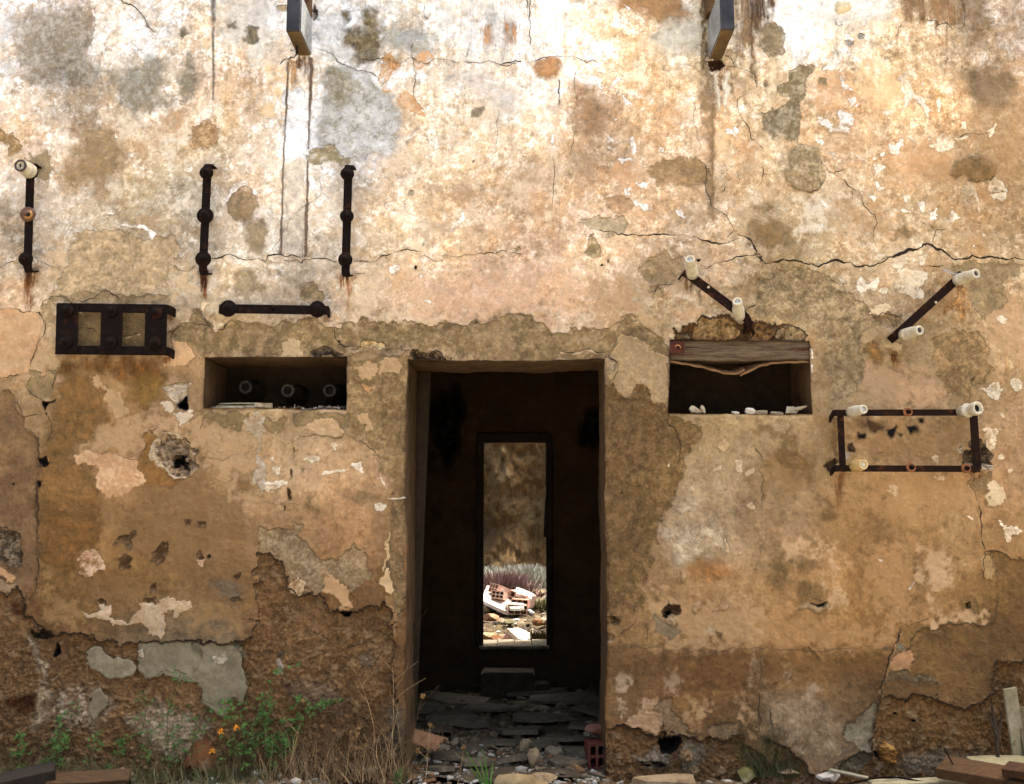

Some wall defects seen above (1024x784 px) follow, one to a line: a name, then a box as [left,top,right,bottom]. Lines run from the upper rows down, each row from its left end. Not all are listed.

crack [896,1,965,36]
crack [172,161,521,274]
crack [280,0,623,249]
flaking render [470,106,485,117]
crack [592,55,1024,271]
peeling [900,195,960,223]
rust [24,271,35,304]
rust [200,272,209,299]
flaking render [0,224,929,784]
crack [968,484,1003,578]
flaking render [828,520,1024,784]